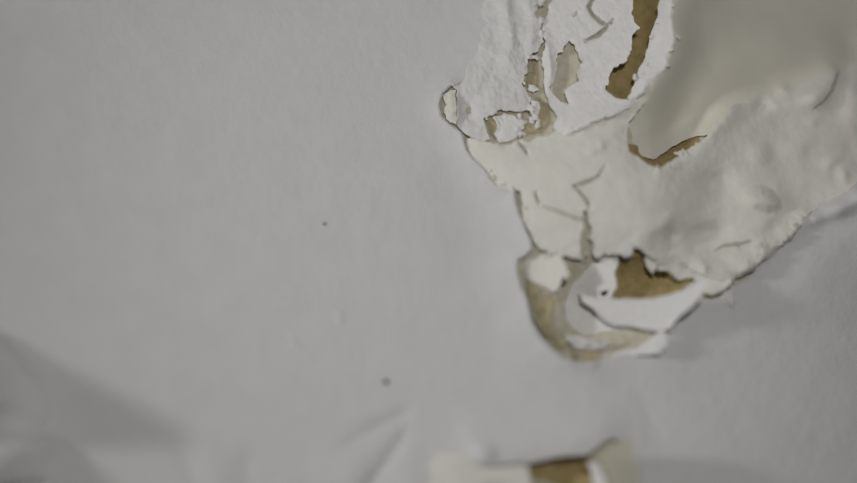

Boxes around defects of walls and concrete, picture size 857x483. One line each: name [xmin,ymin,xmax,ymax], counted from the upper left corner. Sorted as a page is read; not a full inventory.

crack [575,0,613,41]
peeling [440,0,857,299]
crack [515,167,604,246]
peeling [426,439,640,483]